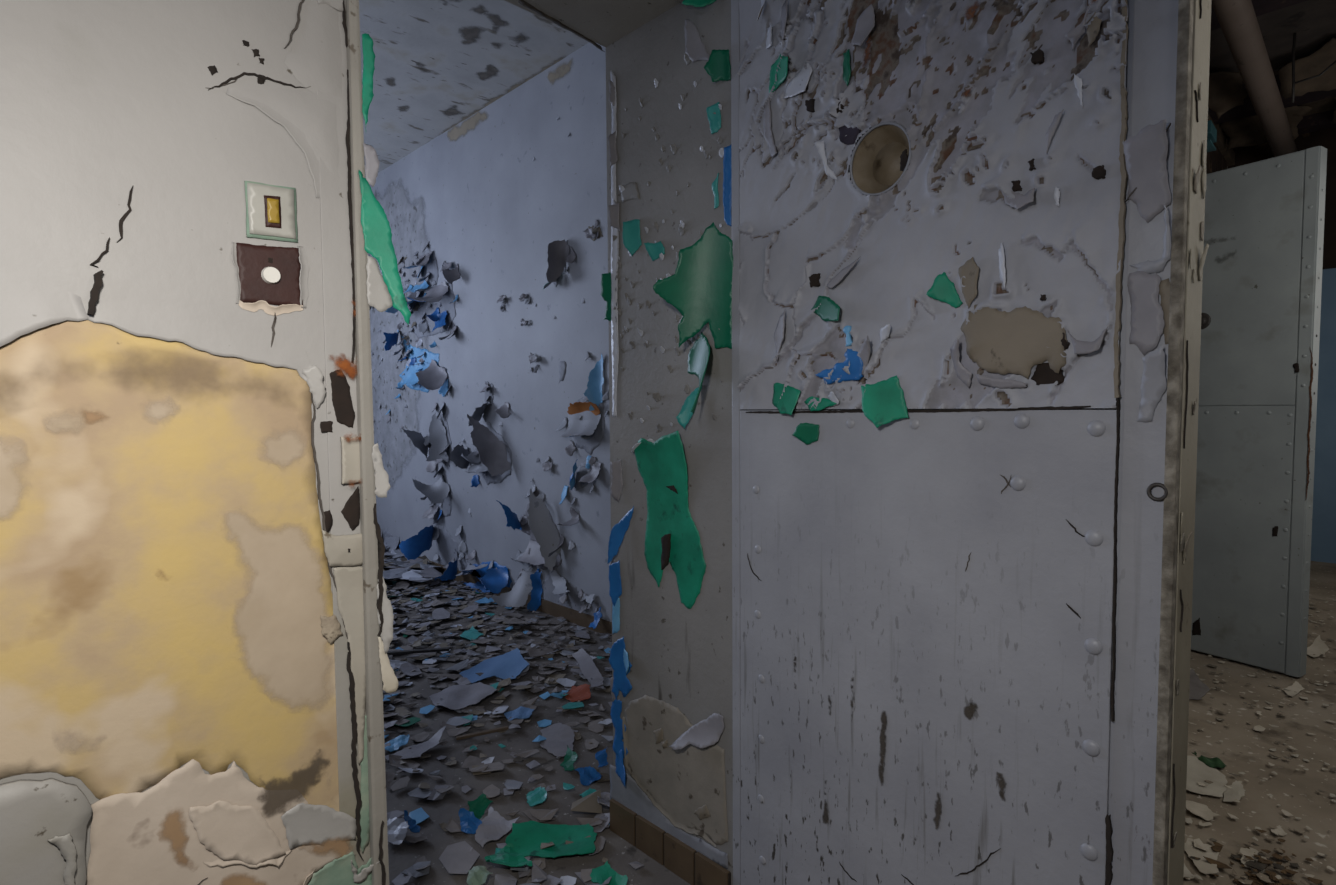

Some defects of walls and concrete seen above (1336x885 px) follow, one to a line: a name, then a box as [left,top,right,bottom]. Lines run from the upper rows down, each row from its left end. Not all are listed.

crack [207,0,346,90]
crack [87,186,133,315]
peeling [358,0,1171,869]
peeling [0,266,380,885]
peeling [458,786,547,885]